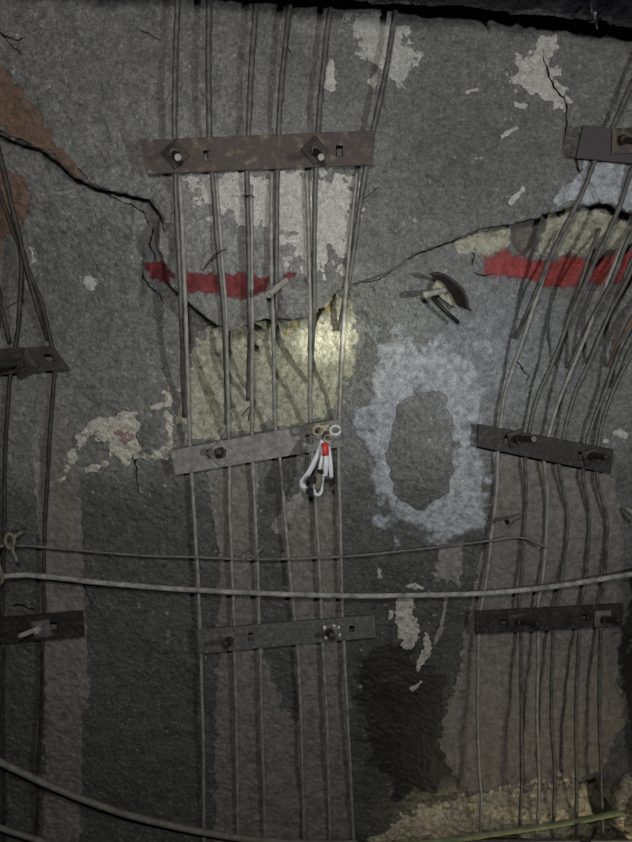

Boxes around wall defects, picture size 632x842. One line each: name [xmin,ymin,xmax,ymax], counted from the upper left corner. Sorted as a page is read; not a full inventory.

rust [0,66,91,184]
crack [542,48,581,173]
crack [0,130,166,301]
crack [410,213,551,277]
crack [589,203,630,221]
spalling [176,293,360,441]
peeling [388,583,432,671]
water stain [207,322,632,842]